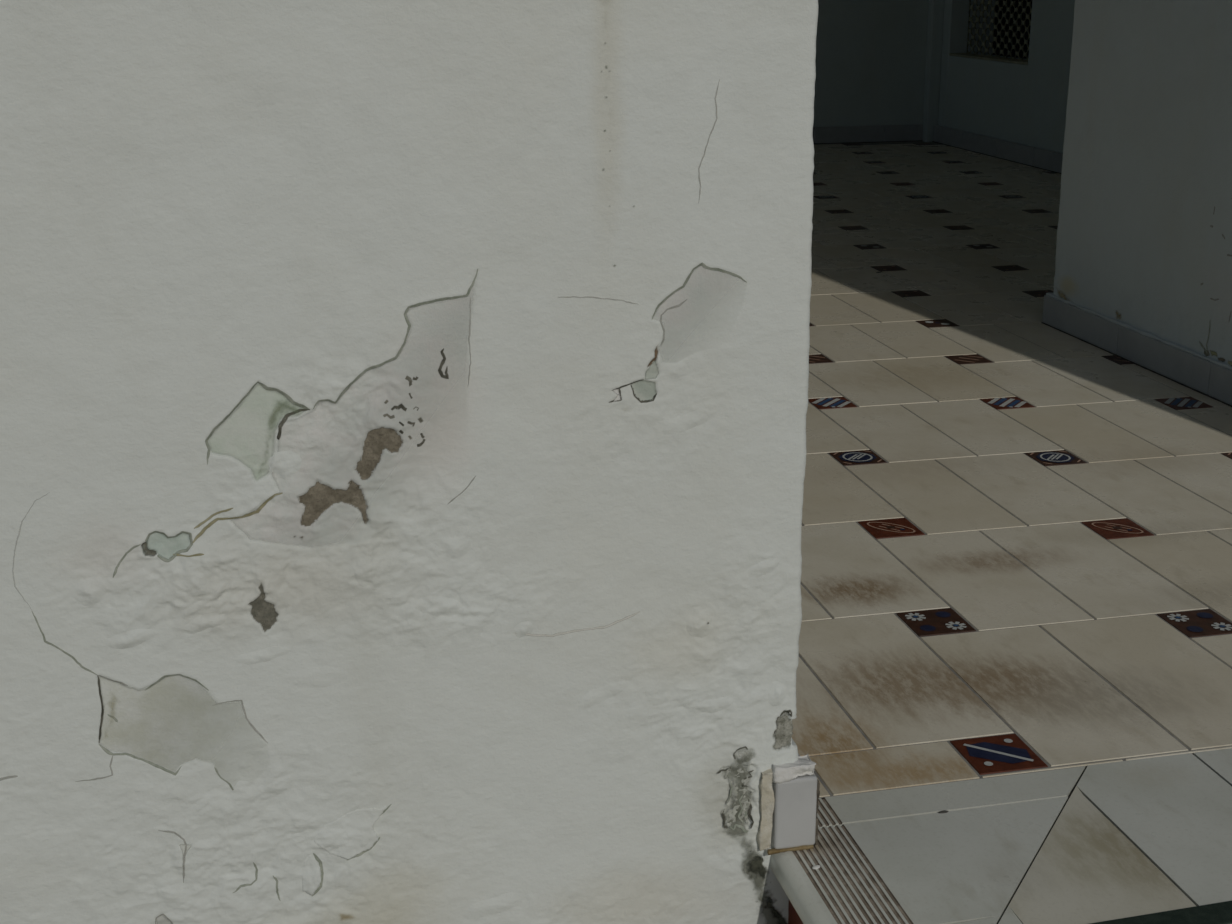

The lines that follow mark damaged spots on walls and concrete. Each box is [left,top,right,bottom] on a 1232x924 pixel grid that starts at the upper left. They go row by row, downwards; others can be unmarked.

crack [698,80,720,200]
peeling [610,263,746,403]
peeling [205,269,478,546]
peeling [142,531,193,562]
crack [32,612,97,675]
flaking render [249,584,278,631]
peeling [75,674,266,782]
flaking render [773,710,793,749]
water stain [727,757,787,924]